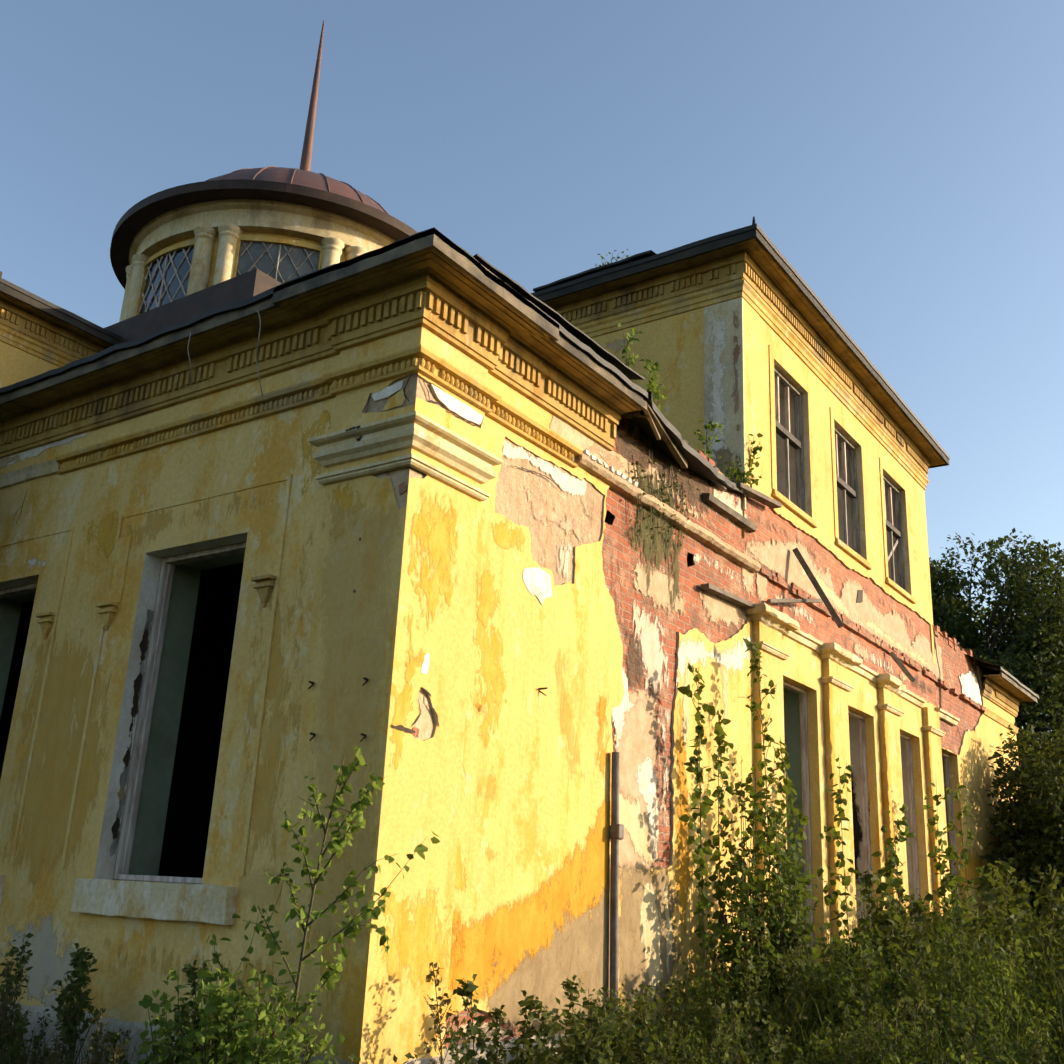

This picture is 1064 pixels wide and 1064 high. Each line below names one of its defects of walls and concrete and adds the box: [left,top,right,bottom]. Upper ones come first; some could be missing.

flaking render [362,373,484,429]
peeling [421,653,430,674]
flaking render [495,415,985,871]
peeling [123,628,149,769]
flaking render [392,687,439,741]
peeling [111,816,120,840]